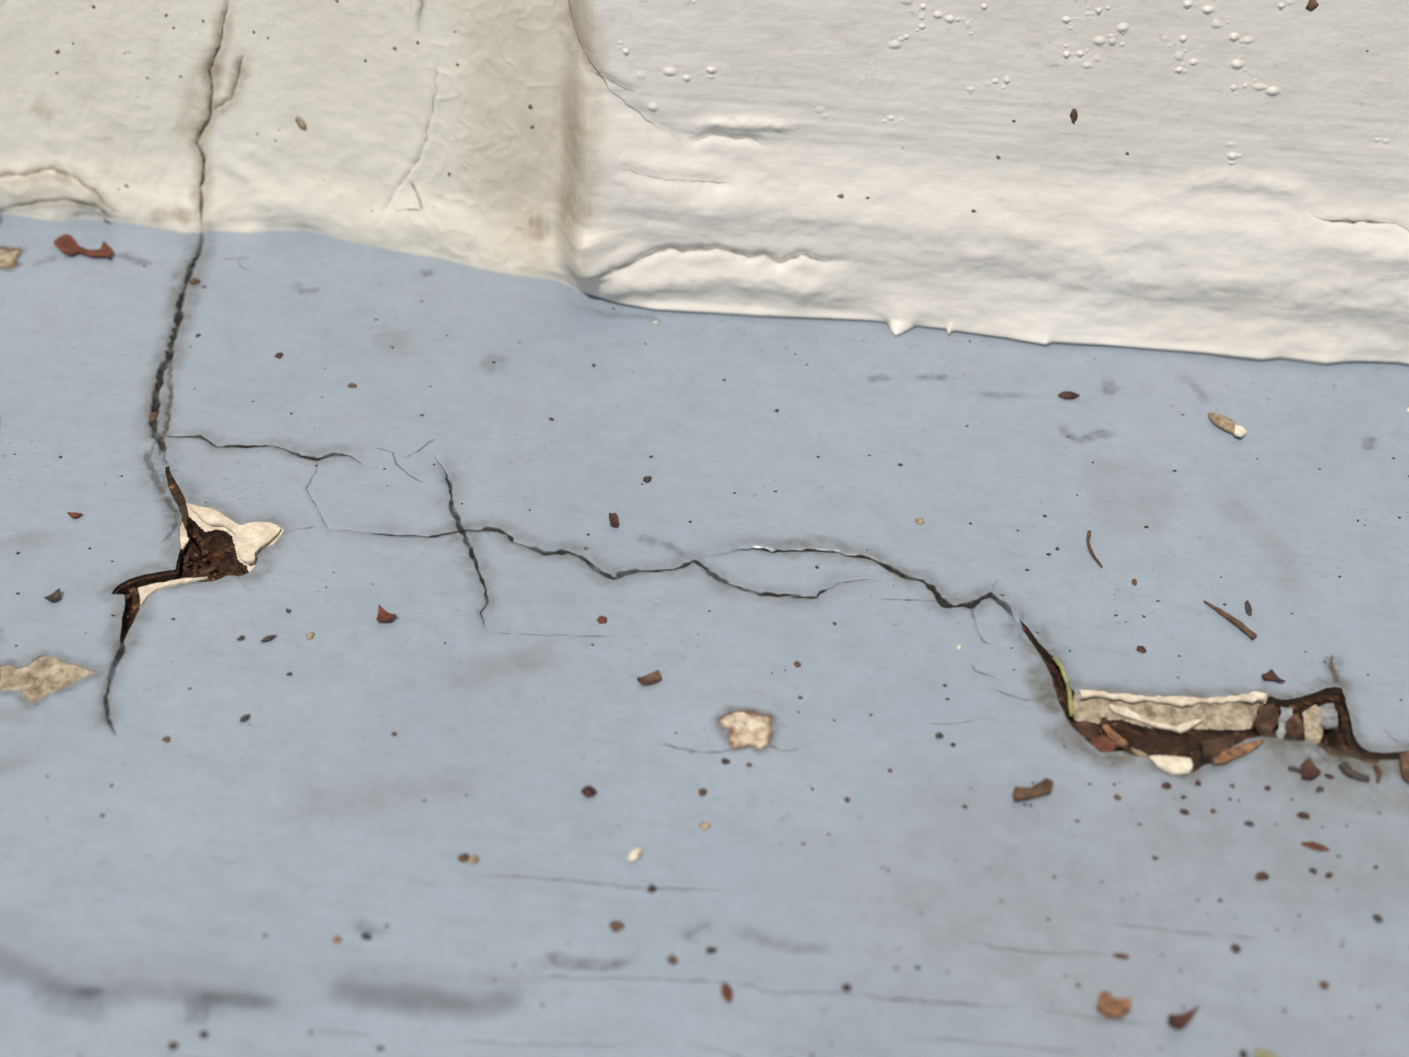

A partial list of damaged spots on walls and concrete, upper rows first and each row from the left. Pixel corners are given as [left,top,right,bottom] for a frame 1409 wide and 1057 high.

crack [149,5,357,461]
crack [608,247,749,273]
crack [1328,219,1409,231]
spalling [111,466,284,643]
crack [372,465,1011,623]
peeling [0,654,96,702]
crack [104,642,125,730]
peeling [718,711,772,749]
spalling [1019,619,1409,774]